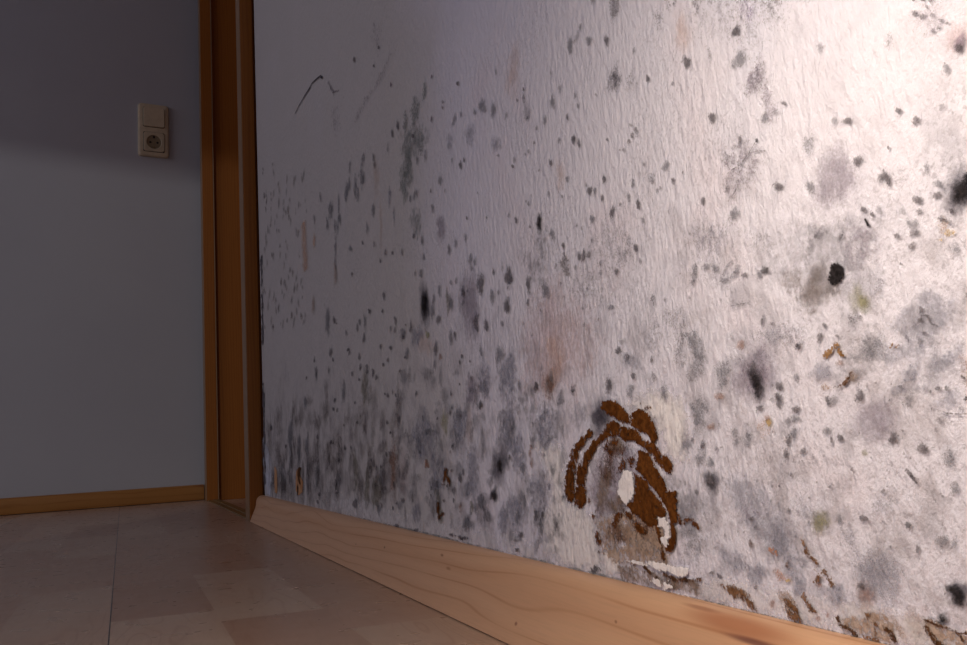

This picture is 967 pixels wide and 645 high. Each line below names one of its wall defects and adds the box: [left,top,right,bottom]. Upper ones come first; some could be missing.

damp [894,197,922,249]
damp [933,172,967,223]
damp [421,293,440,323]
damp [561,243,590,275]
damp [803,263,844,302]
damp [686,331,704,381]
damp [716,354,783,411]
damp [263,445,272,496]
damp [495,450,510,477]
damp [335,479,498,551]
damp [513,373,959,645]
damp [945,585,967,606]